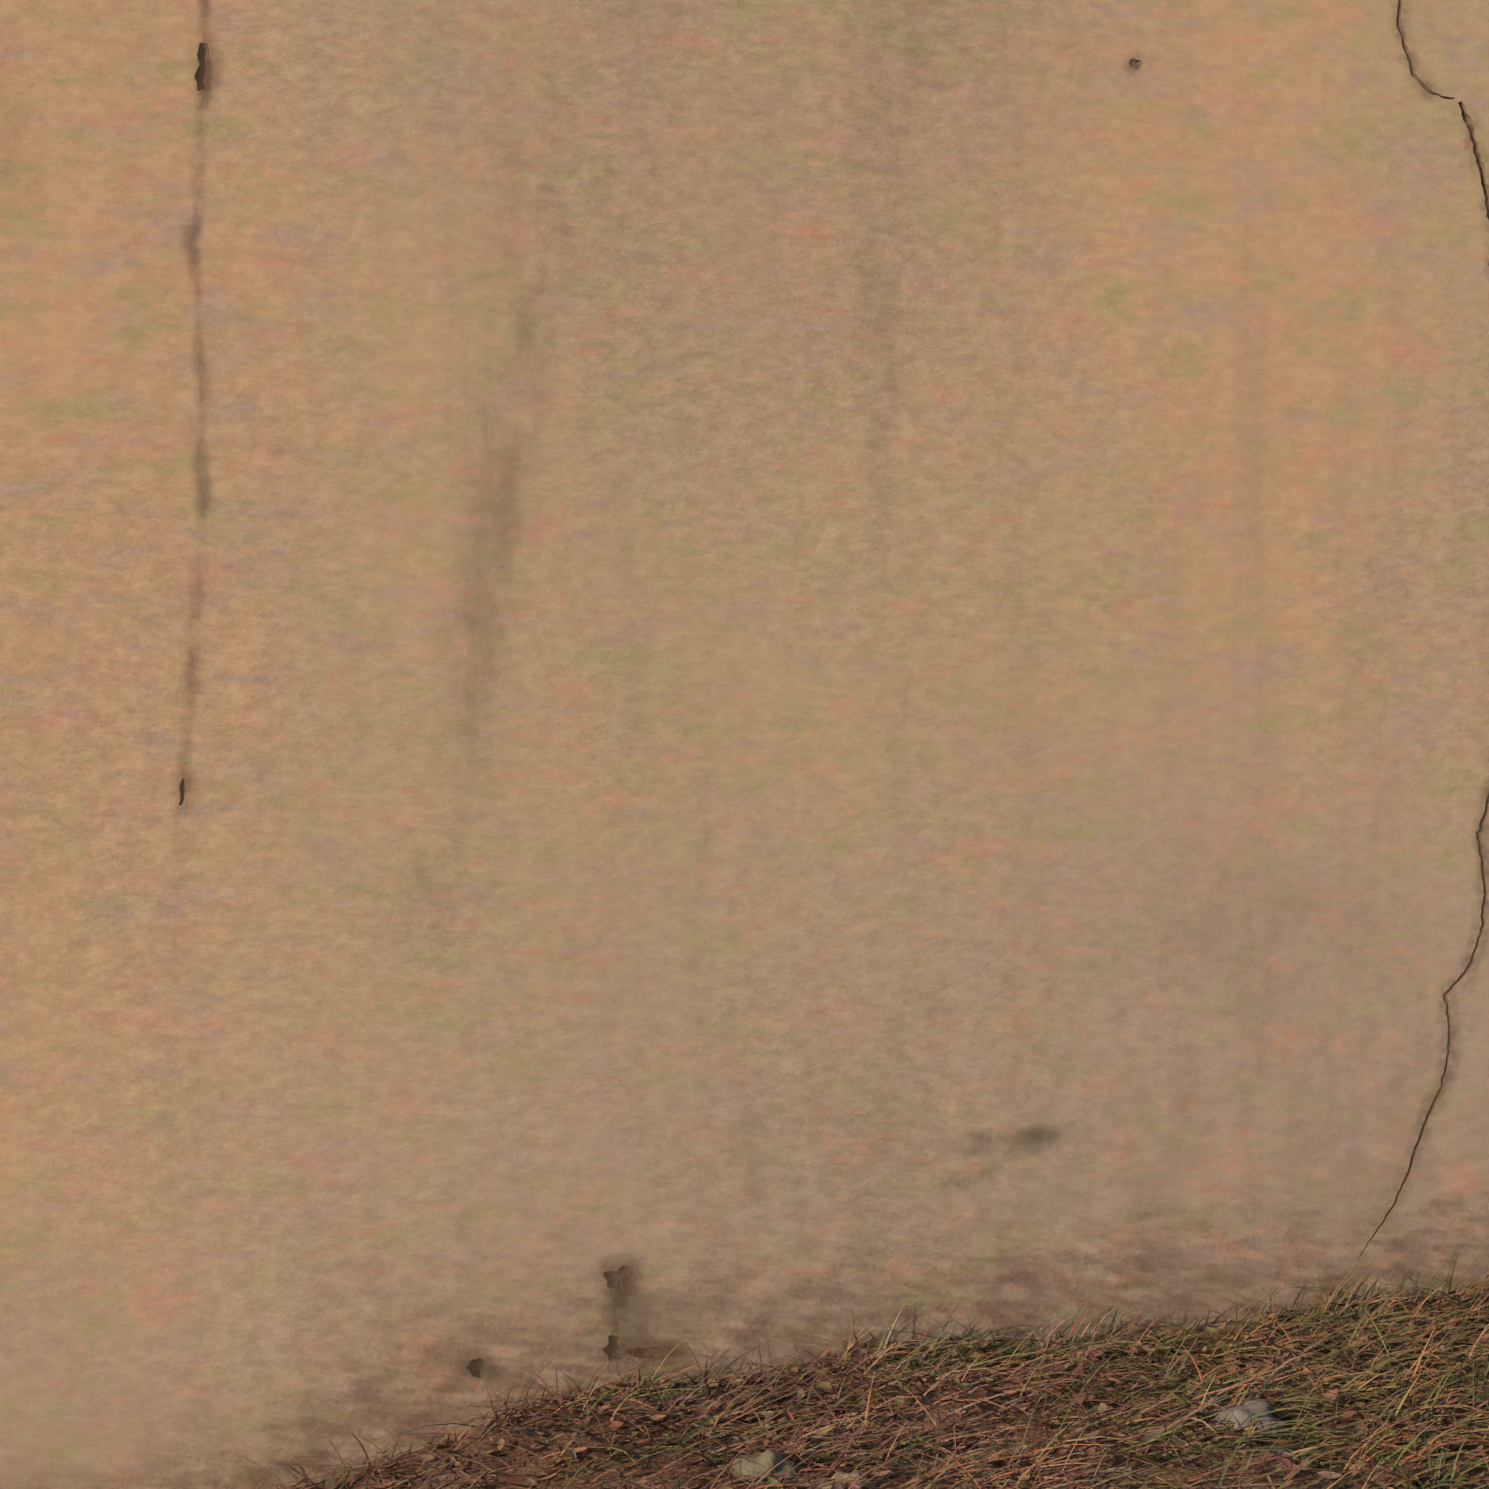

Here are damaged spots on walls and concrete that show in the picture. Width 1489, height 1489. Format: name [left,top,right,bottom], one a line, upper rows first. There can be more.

crack [194,43,212,91]
crack [1396,0,1489,219]
crack [178,778,186,805]
crack [1357,793,1489,1260]